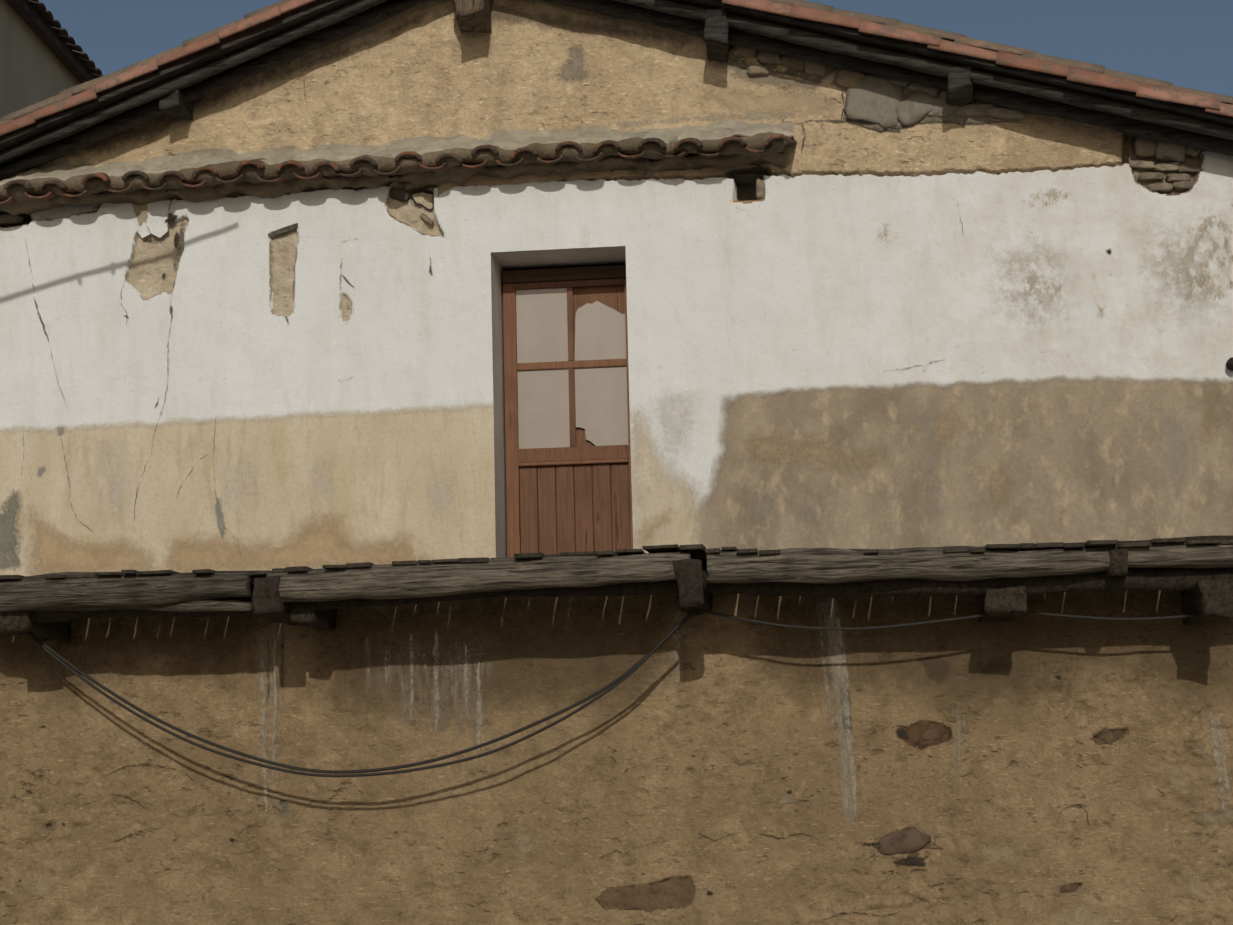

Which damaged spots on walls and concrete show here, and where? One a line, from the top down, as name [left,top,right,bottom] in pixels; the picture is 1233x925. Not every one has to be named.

flaking render [728,46,1030,132]
crack [25,239,63,396]
spalling [125,198,189,301]
spalling [268,223,300,321]
spalling [338,293,354,324]
spalling [384,168,612,238]
leakage [0,405,496,576]
leakage [260,629,284,819]
leakage [332,611,659,755]
spalling [896,720,954,750]
leakage [770,593,1230,823]
spalling [595,876,699,913]